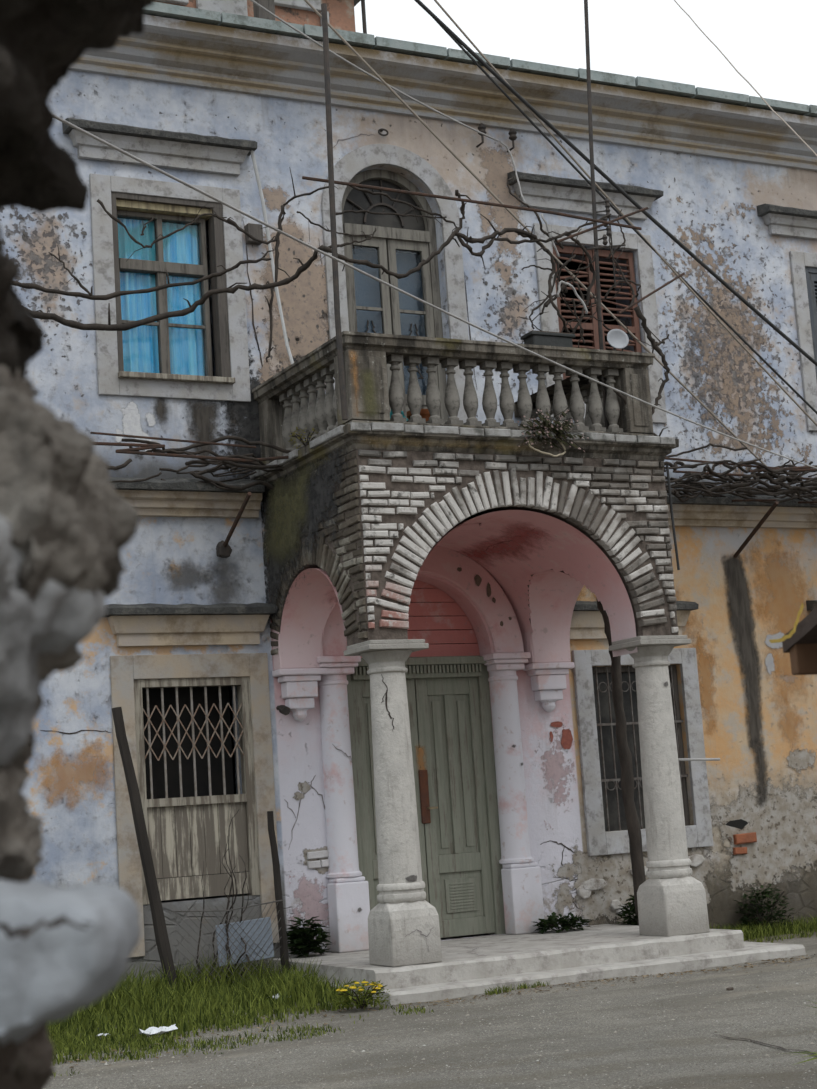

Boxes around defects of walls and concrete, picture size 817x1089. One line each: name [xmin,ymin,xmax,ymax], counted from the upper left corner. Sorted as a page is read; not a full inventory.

flaking render [477,146,527,325]
flaking render [658,186,812,483]
peeling [535,718,576,806]
flaking render [552,845,649,924]
leakage [723,555,767,805]
flaking render [688,748,817,904]